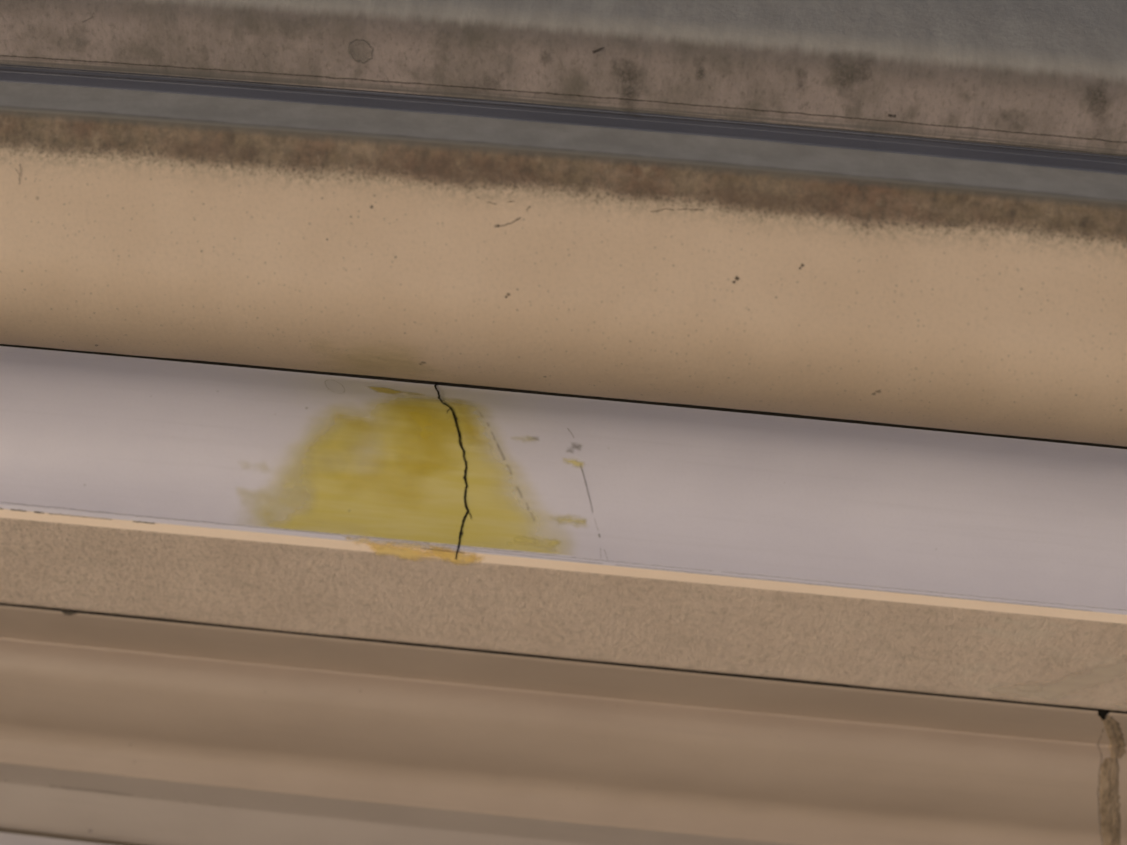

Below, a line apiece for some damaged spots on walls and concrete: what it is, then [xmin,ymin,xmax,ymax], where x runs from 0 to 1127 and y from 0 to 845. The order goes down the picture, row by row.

water stain [276,387,558,563]
crack [424,382,472,559]